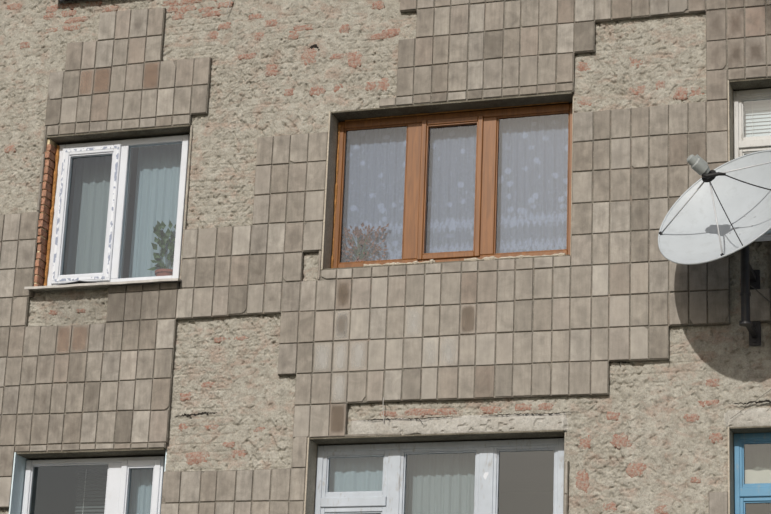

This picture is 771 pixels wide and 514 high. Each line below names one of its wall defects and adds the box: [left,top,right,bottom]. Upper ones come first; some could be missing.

spalling [0,0,417,229]
spalling [573,13,706,113]
spalling [28,288,109,326]
spalling [165,314,296,472]
spalling [347,242,771,514]
crack [729,398,771,406]